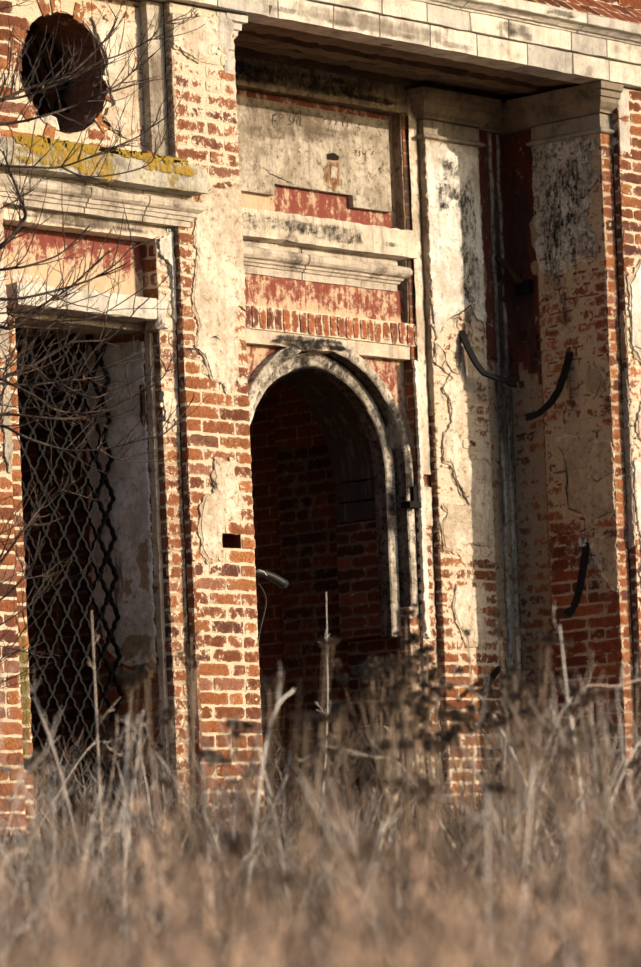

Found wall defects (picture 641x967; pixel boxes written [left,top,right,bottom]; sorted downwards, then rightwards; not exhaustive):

water stain [80,166,115,181]
peeling [90,14,138,139]
peeling [170,13,221,64]
peeling [191,183,246,395]
peeling [197,457,245,564]
peeling [412,360,431,639]
peeling [423,138,494,557]
peeling [451,584,499,649]
water stain [436,158,589,520]
peeling [555,259,641,592]